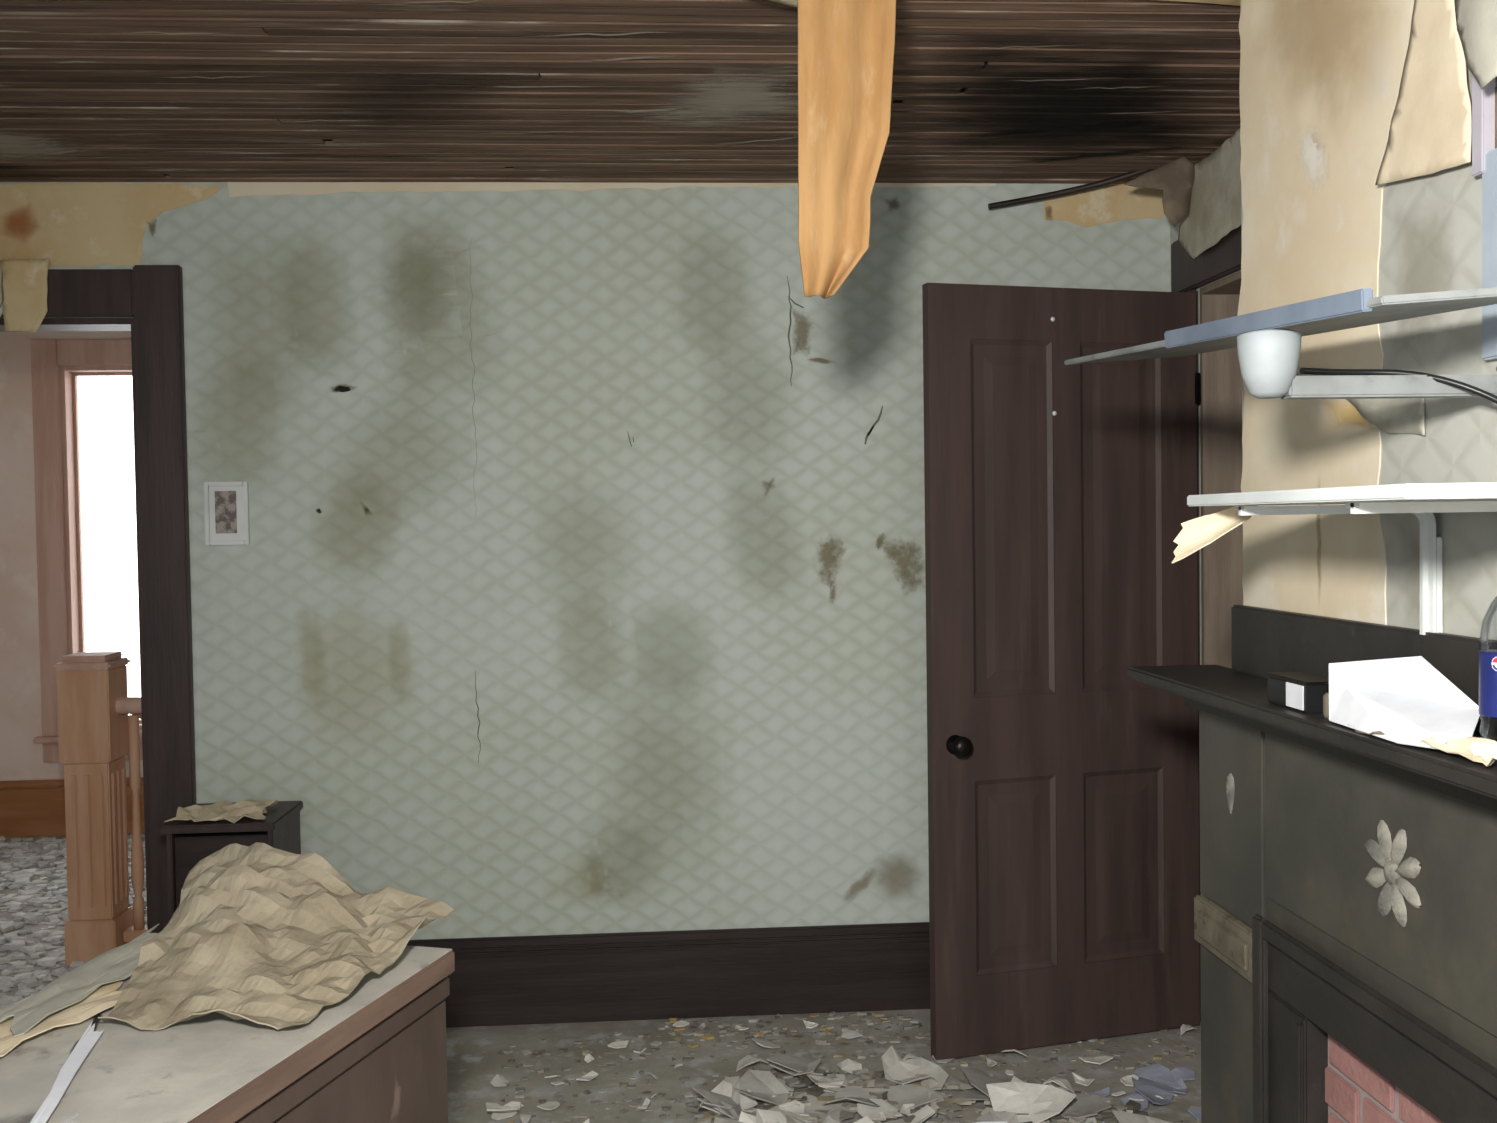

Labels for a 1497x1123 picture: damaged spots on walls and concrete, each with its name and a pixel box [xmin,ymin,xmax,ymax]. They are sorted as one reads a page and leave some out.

water stain [939,38,1197,162]
water stain [0,133,79,178]
peeling [0,0,996,333]
peeling [1044,0,1497,316]
water stain [795,321,829,363]
peeling [1296,324,1384,376]
peeling [1241,378,1425,625]
water stain [821,541,836,598]
water stain [877,538,921,584]